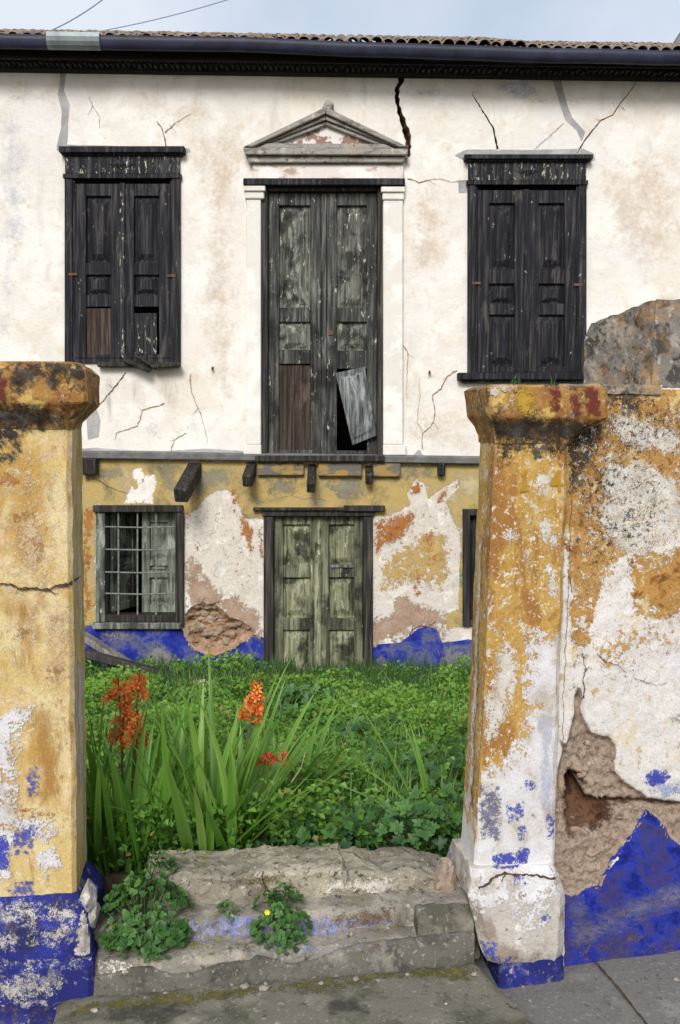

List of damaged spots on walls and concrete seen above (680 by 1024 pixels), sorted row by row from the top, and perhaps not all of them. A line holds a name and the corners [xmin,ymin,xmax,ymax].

crack [395,78,464,184]
crack [472,91,498,150]
crack [536,80,637,153]
damp [0,402,69,464]
peeling [124,467,157,504]
damp [492,393,680,595]
crack [0,576,81,594]
spalling [184,489,264,667]
peeling [373,483,472,669]
peeling [506,778,537,824]
spalling [545,686,680,897]
crack [478,871,555,889]